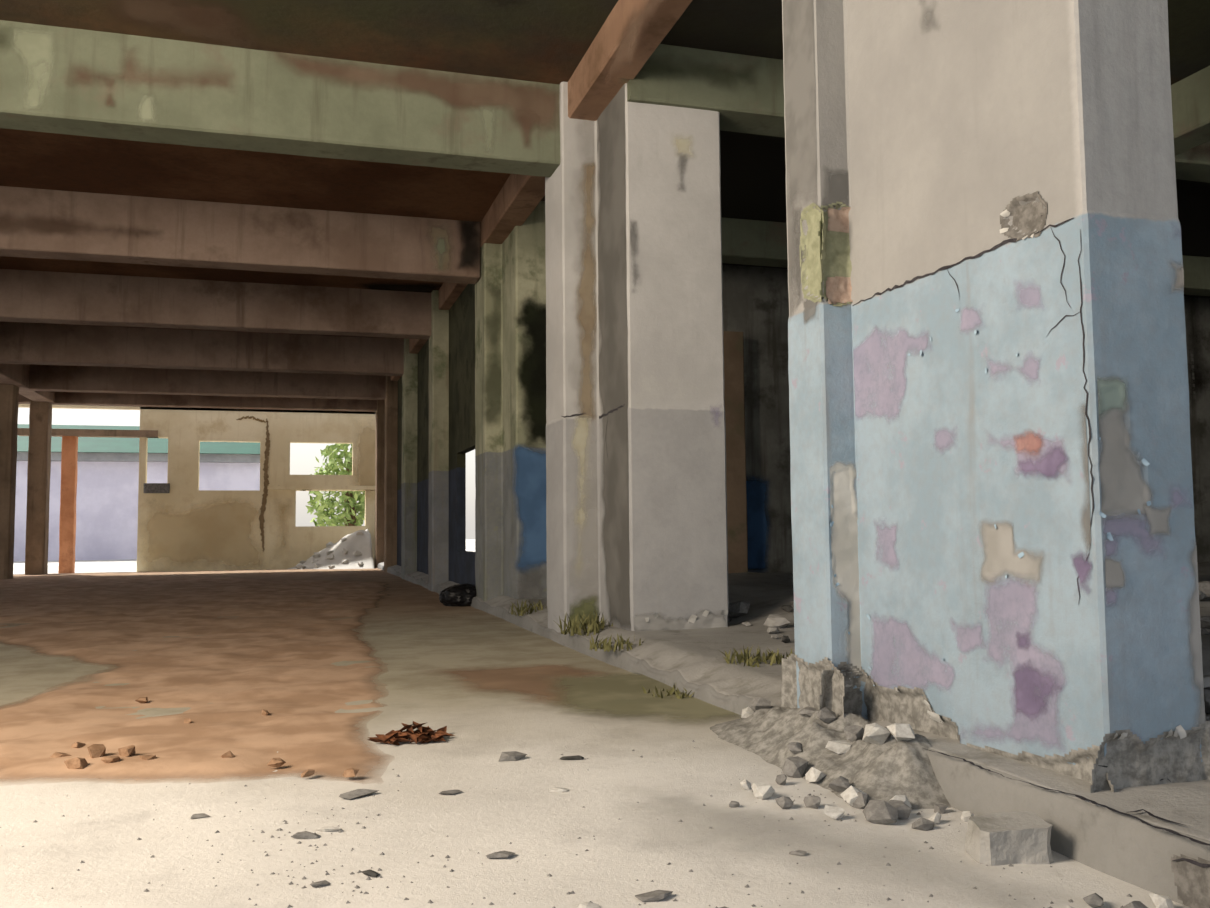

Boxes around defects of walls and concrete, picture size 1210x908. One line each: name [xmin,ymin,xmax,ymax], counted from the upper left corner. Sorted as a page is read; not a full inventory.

leakage [0,31,54,107]
leakage [140,97,153,120]
mould [485,314,502,421]
mould [517,299,546,442]
crack [852,215,1094,604]
crack [236,416,312,552]
peeling [1097,379,1171,604]
spalling [781,463,1210,793]